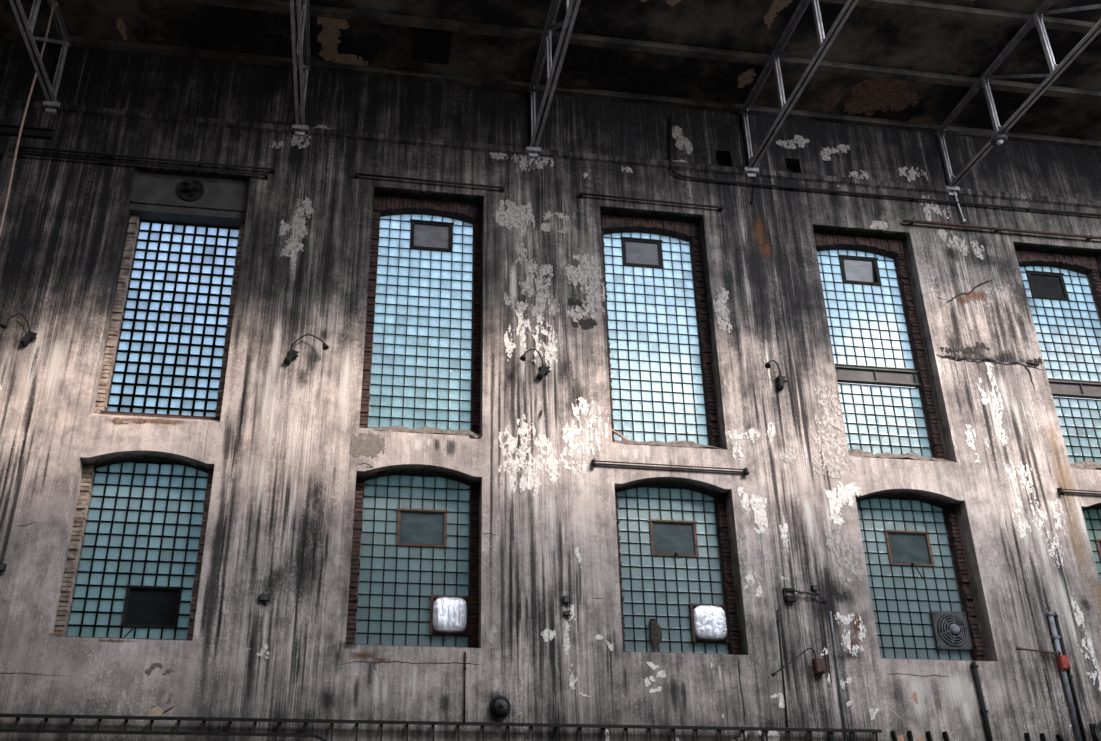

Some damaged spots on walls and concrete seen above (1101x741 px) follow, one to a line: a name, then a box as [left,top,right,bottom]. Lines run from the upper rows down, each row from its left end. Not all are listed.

damp [284,211,334,298]
peeling [496,199,606,370]
damp [732,235,791,304]
crack [936,280,993,303]
damp [339,350,351,431]
damp [196,322,328,692]
peeling [498,397,612,496]
peeling [738,487,789,552]
damp [753,347,851,710]
peeling [811,384,862,586]
peeling [1004,460,1067,568]
peeling [834,612,866,656]